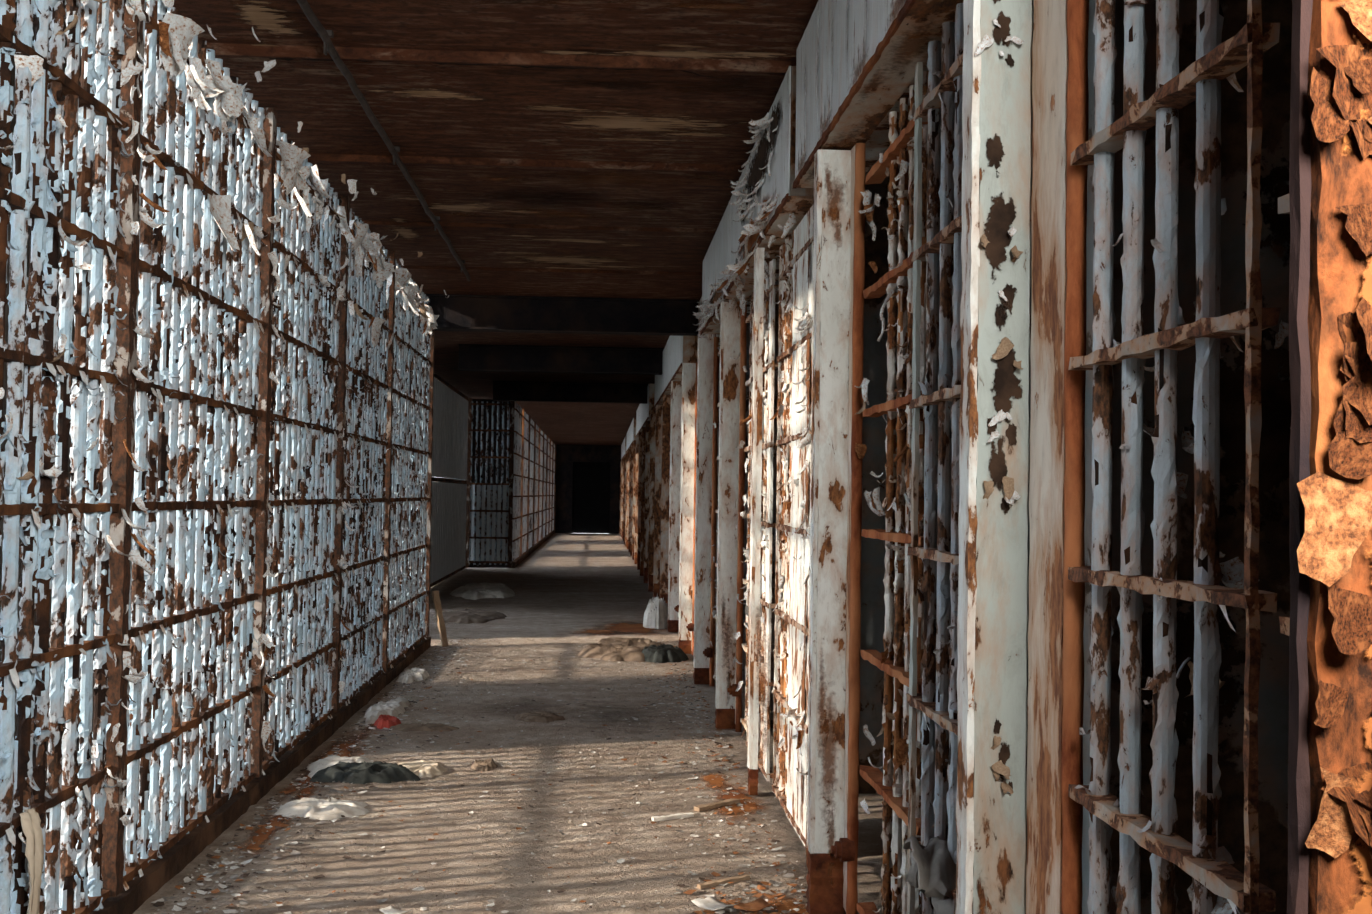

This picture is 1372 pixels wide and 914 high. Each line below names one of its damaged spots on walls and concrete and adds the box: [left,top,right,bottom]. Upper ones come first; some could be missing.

peeling [975,0,1025,67]
peeling [14,54,44,86]
peeling [120,0,545,349]
peeling [58,219,94,270]
peeling [980,133,1024,515]
peeling [132,369,157,383]
peeling [16,451,63,480]
peeling [106,497,157,574]
peeling [114,634,148,683]
peeling [258,633,275,697]
peeling [87,702,134,825]
peeling [261,721,272,752]